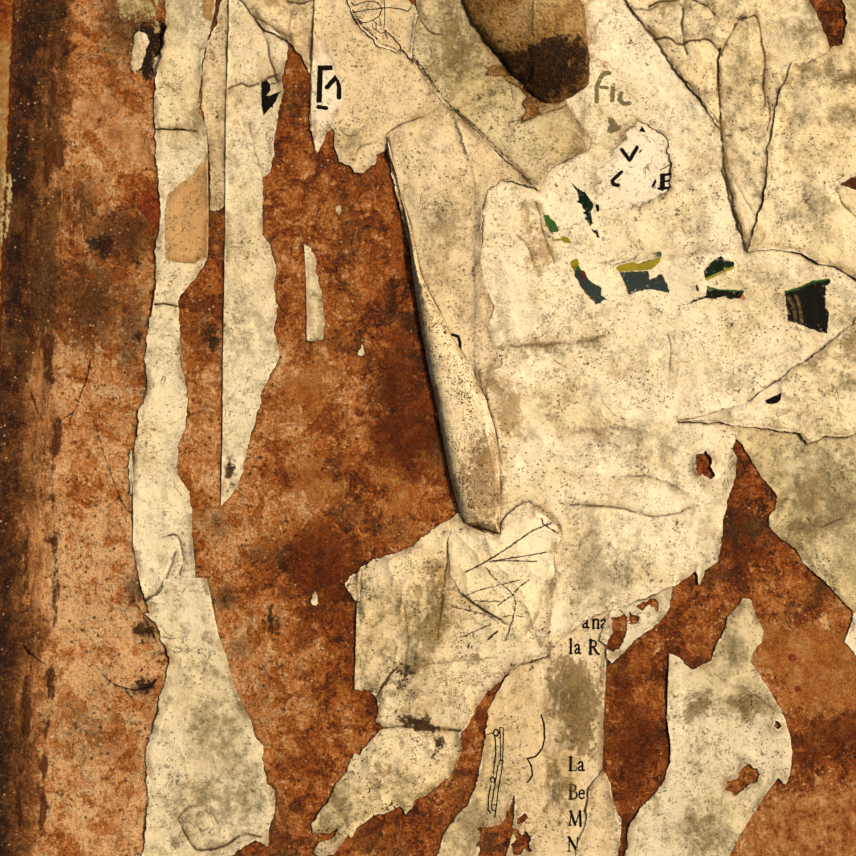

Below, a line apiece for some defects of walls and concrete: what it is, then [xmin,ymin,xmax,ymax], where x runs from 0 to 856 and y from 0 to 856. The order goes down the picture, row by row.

spalling [126,19,165,81]
water stain [0,120,67,288]
water stain [28,317,55,384]
water stain [49,417,62,469]
flaking render [366,447,428,537]
water stain [48,526,60,625]
corrosion [292,523,362,650]
water stain [20,675,32,739]
water stain [46,667,55,699]
flaking render [757,612,856,721]
water stain [38,753,49,829]
spalling [736,771,856,856]